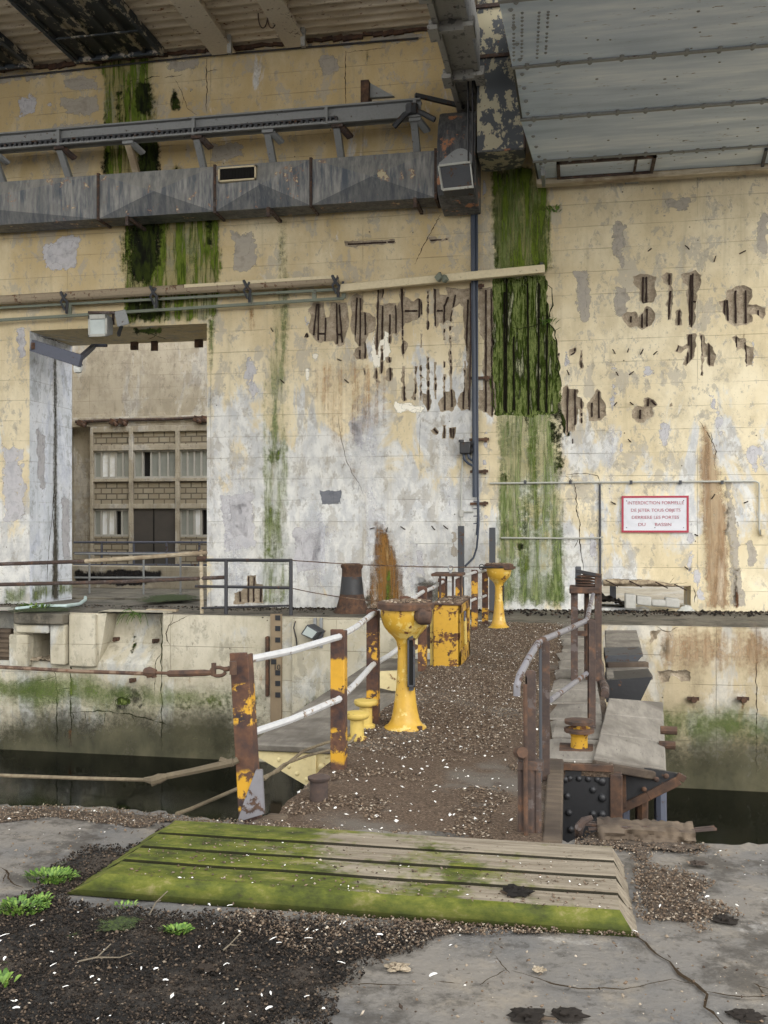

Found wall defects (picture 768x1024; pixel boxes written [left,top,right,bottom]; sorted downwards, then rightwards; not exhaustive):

damp [138,142,161,172]
damp [125,224,163,285]
damp [127,300,170,334]
spalling [305,270,617,436]
spalling [613,270,716,376]
spalling [719,285,766,367]
damp [550,414,570,472]
spalling [632,397,671,446]
rust [367,523,403,608]
damp [0,678,235,760]
damp [664,711,768,792]
crack [439,936,768,1024]